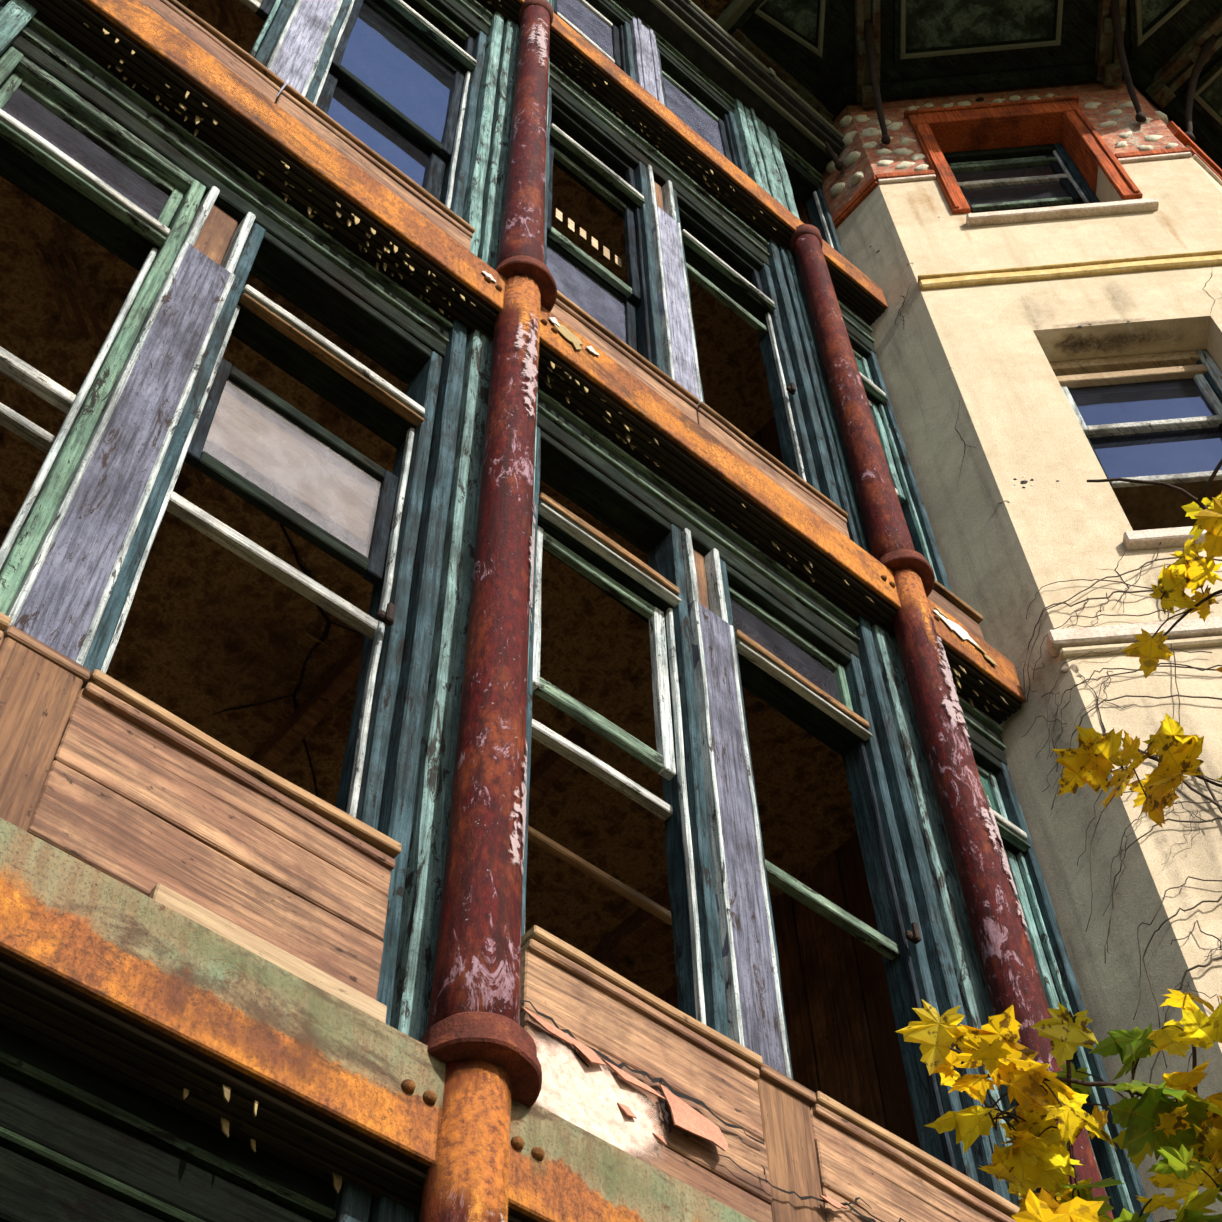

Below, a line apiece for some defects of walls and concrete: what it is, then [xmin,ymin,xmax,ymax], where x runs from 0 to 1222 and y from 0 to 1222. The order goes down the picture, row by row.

corrosion [186,52,338,168]
corrosion [504,278,541,360]
corrosion [896,572,939,637]
peeling [932,606,1008,748]
peeling [981,799,1030,940]
corrosion [436,1071,511,1222]
peeling [520,1006,728,1153]
crack [520,999,906,1222]